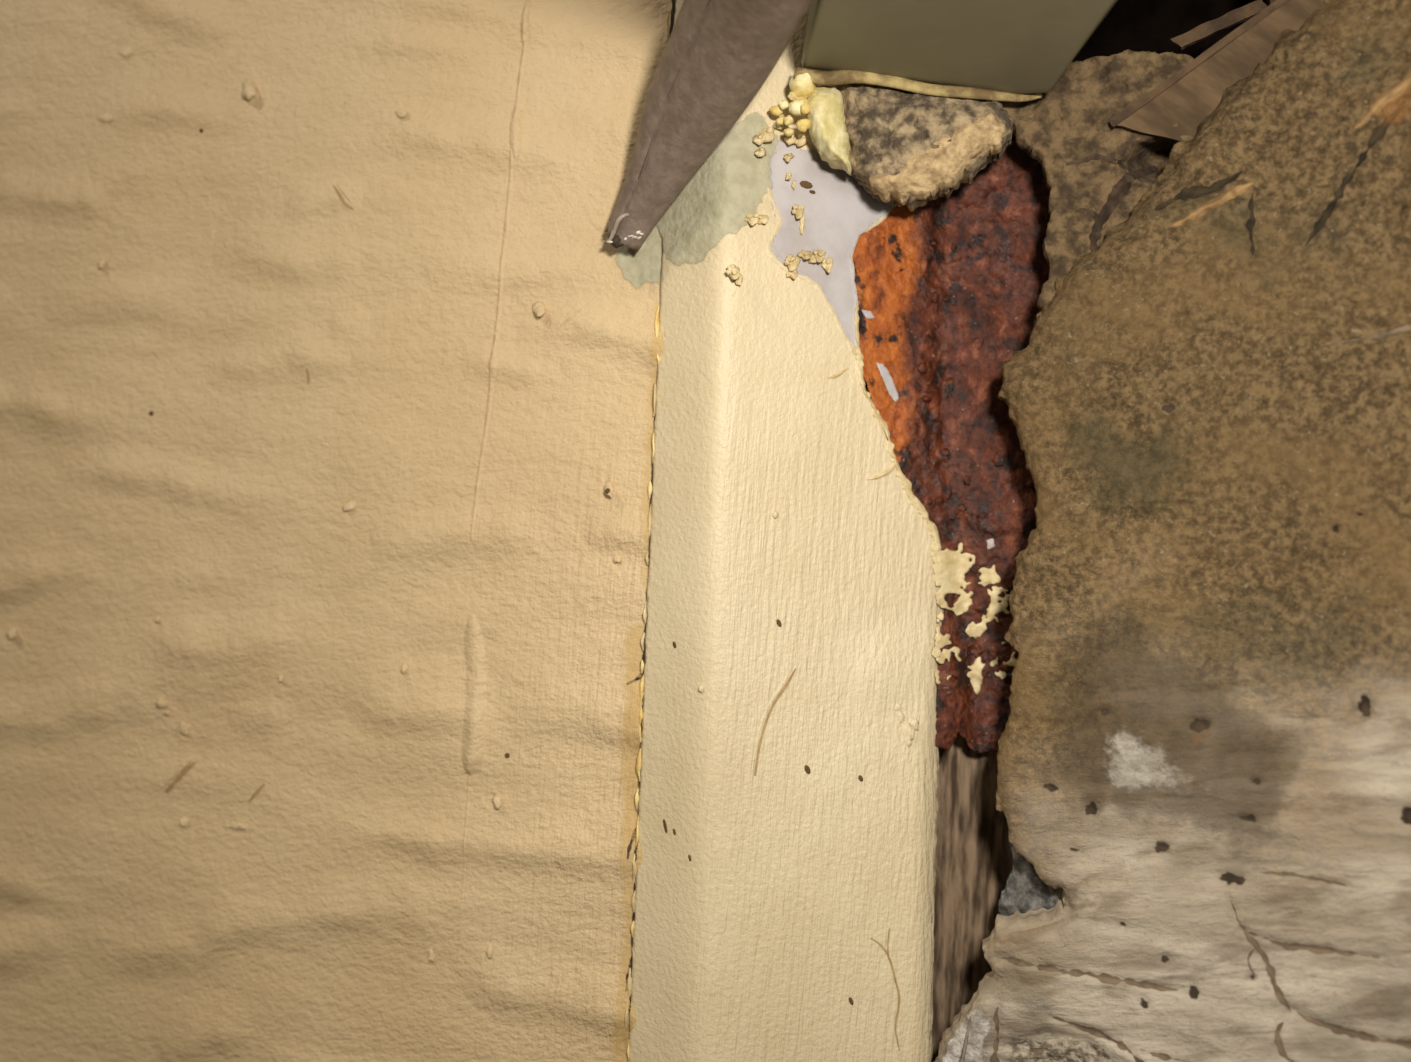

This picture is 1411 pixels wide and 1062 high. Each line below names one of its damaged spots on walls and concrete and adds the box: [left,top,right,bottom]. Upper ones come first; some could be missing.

peeling [765,140,1016,694]
corrosion [852,140,1050,753]
crack [1261,872,1347,886]
crack [1002,957,1177,991]
crack [1231,902,1411,1062]
crack [990,1007,999,1062]
crack [1053,1017,1189,1062]